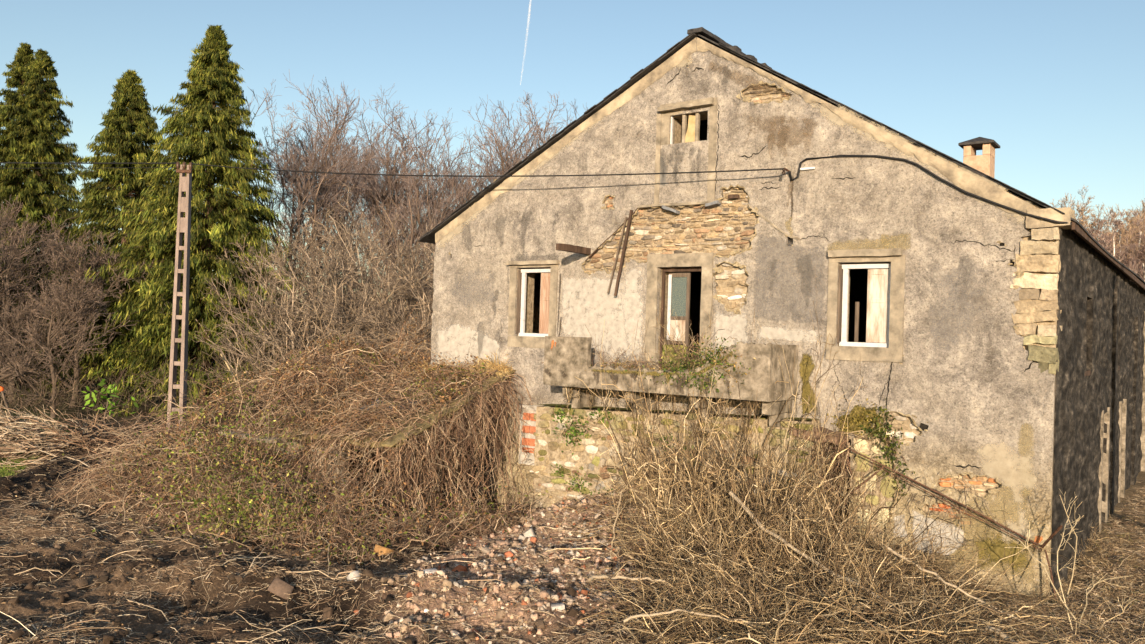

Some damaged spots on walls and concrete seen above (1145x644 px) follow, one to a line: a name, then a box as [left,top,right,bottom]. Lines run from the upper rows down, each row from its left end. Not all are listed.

flaking render [736,81,793,105]
peeling [562,184,818,359]
peeling [846,411,1036,555]
leakage [949,424,1034,576]